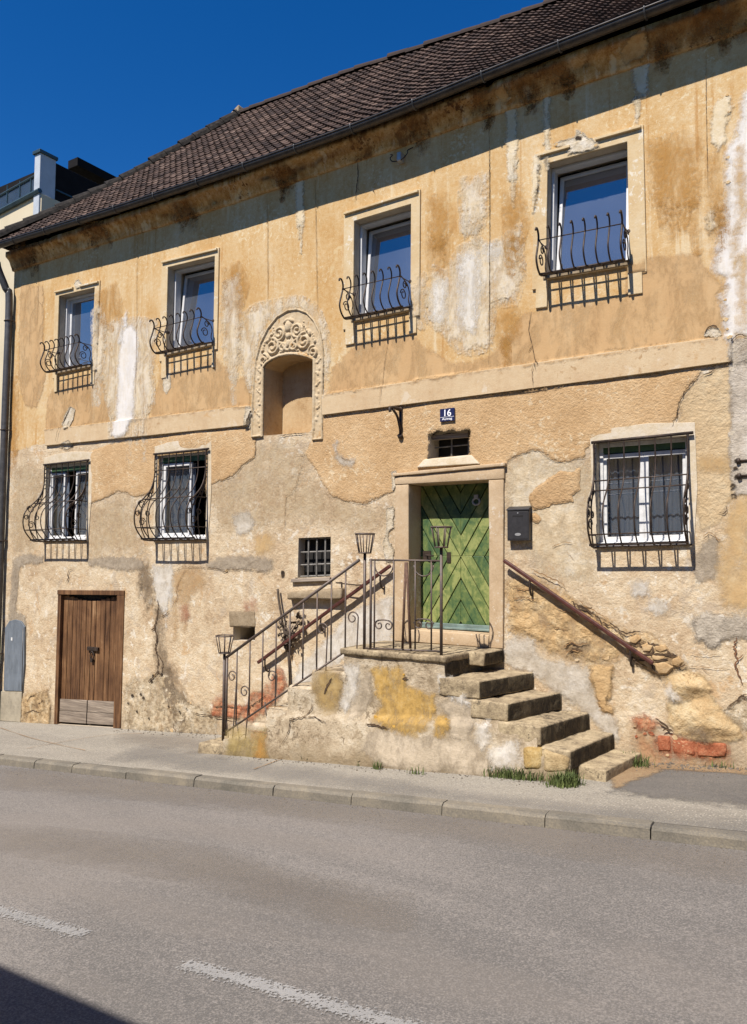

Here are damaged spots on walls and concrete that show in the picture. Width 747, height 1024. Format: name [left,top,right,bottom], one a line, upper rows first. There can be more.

flaking render [553,129,599,154]
damp [272,163,305,254]
damp [97,287,149,460]
flaking render [13,466,40,552]
flaking render [678,363,737,582]
crack [151,566,264,674]
flaking render [504,453,627,714]
flaking render [21,690,50,724]
flaking render [123,669,286,734]
peeling [371,666,449,737]
flaking render [632,714,731,766]